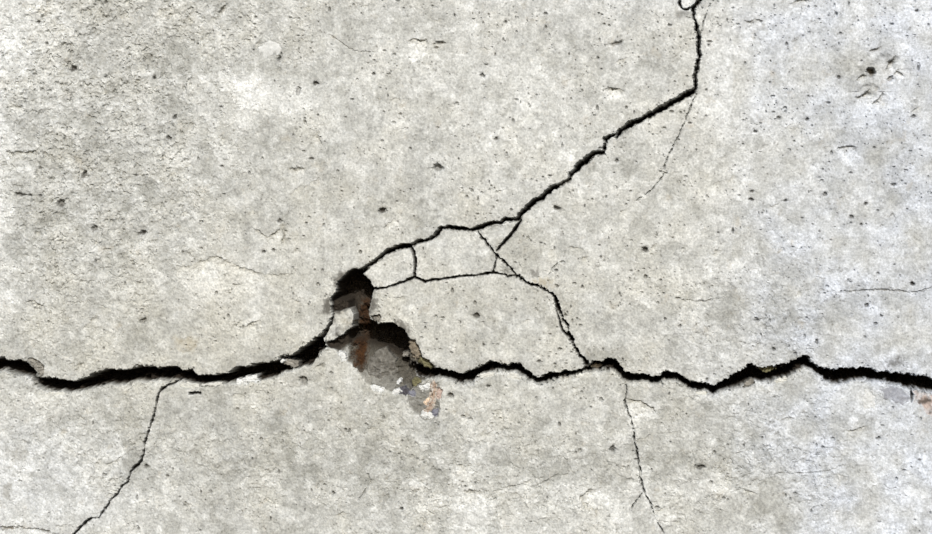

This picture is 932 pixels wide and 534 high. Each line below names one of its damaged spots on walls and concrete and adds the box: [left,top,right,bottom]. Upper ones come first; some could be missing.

crack [329,34,378,54]
crack [0,314,334,534]
spalling [330,268,376,314]
rust [348,293,378,372]
spalling [324,314,443,424]
crack [357,0,932,534]